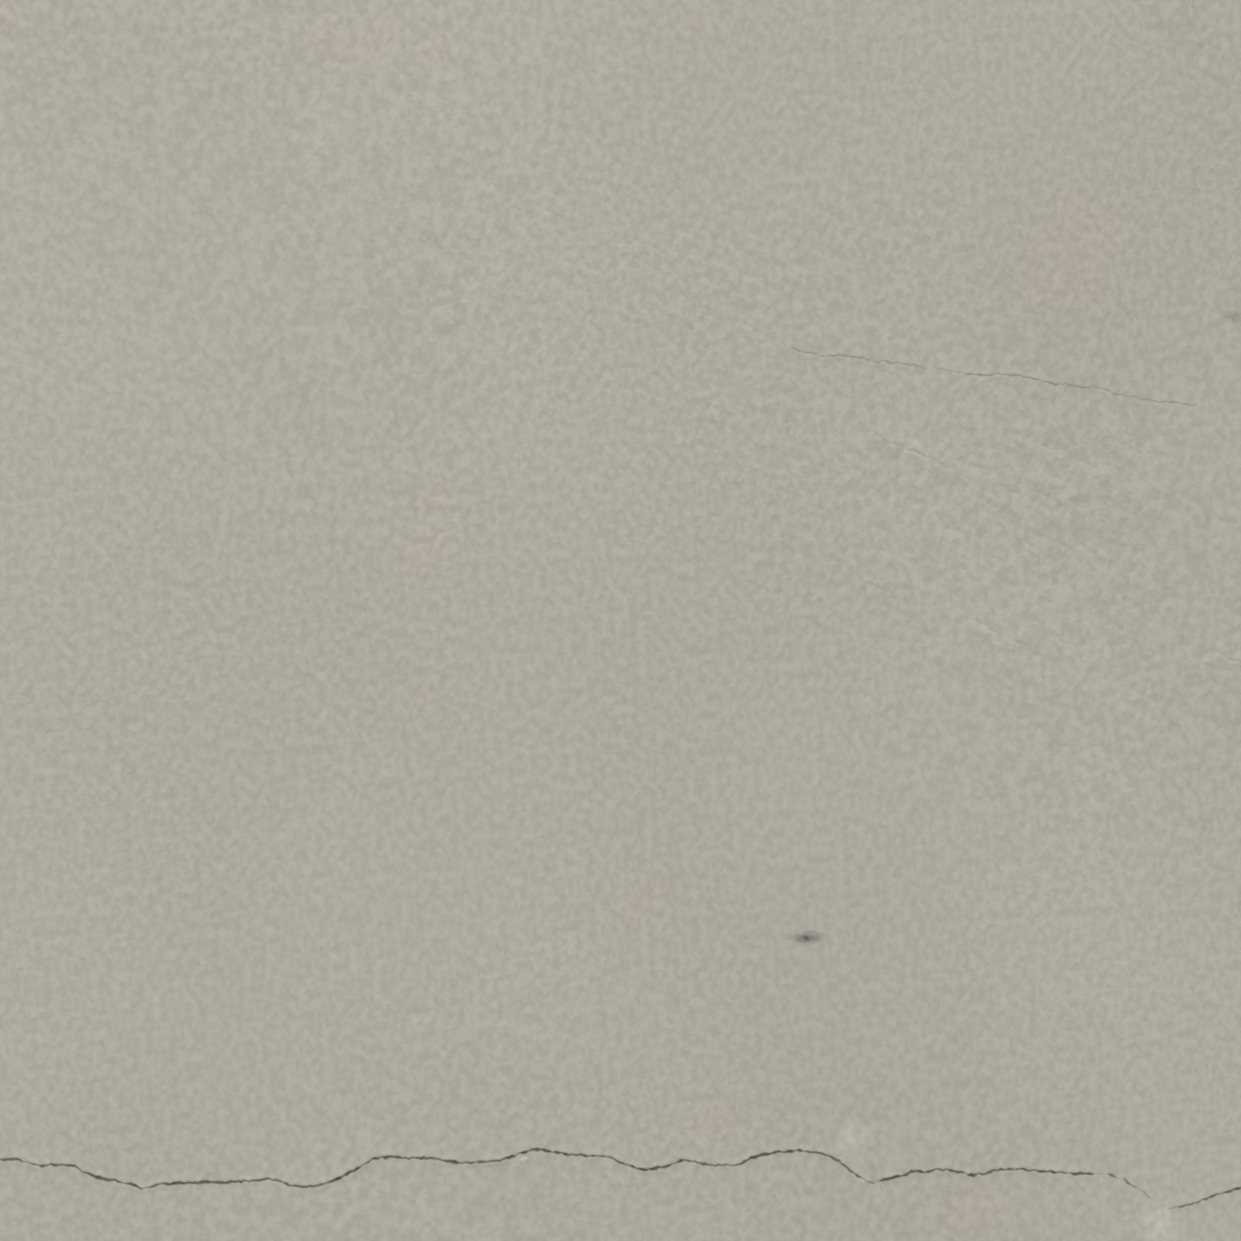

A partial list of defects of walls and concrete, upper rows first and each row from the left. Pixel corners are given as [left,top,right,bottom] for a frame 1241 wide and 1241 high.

crack [0,1142,1241,1213]